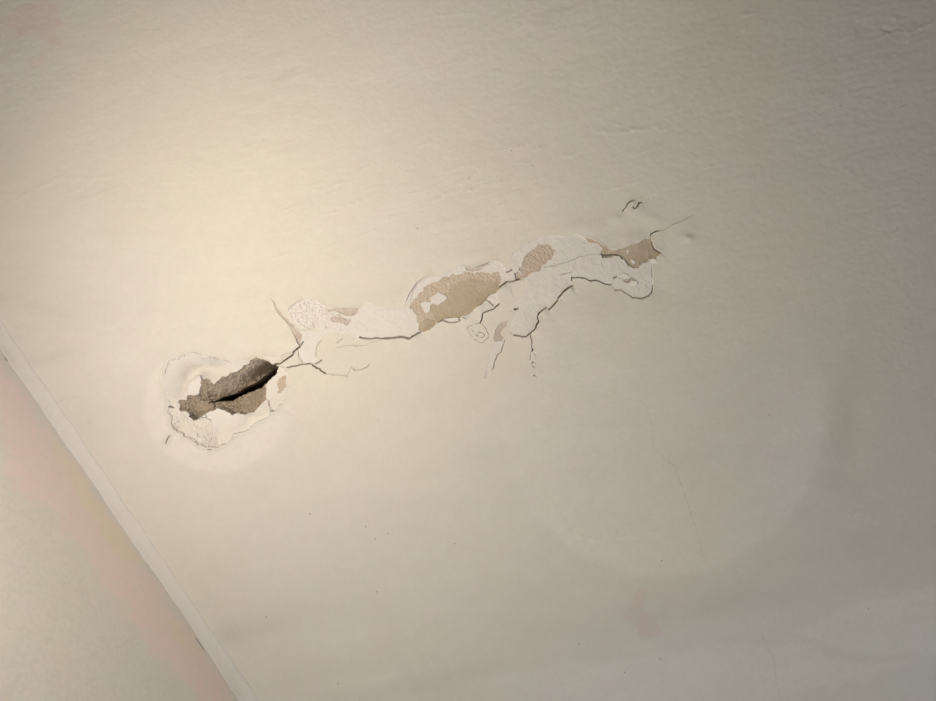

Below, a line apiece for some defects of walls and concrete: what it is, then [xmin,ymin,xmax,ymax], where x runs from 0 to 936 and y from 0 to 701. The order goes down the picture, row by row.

crack [265,301,370,376]
peeling [287,214,694,378]
peeling [168,358,288,447]